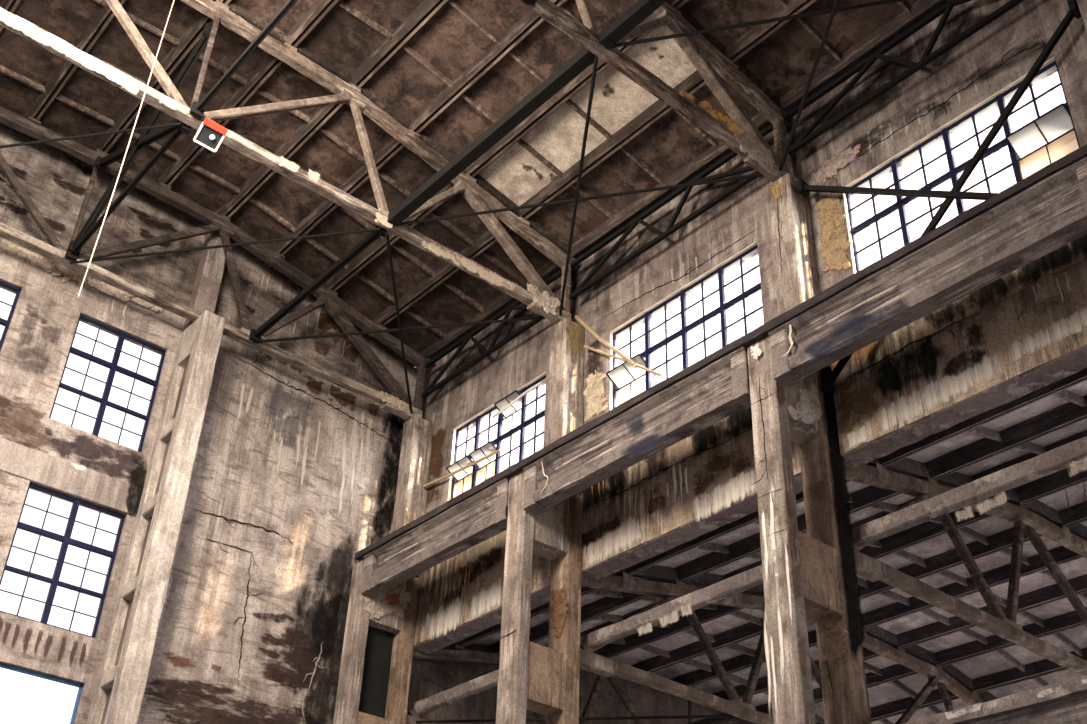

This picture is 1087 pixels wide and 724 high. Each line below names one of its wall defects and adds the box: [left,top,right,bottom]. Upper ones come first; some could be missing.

peeling [0,9,139,94]
peeling [160,95,178,109]
peeling [279,157,320,181]
peeling [375,212,392,228]
peeling [811,144,861,275]
peeling [423,241,560,315]
water stain [837,324,1001,448]
water stain [0,395,143,483]
water stain [646,449,756,521]
water stain [582,515,645,565]
crack [186,506,295,685]
water stain [142,612,326,724]